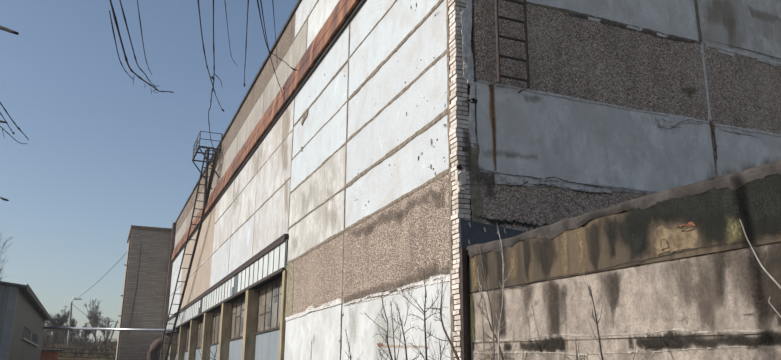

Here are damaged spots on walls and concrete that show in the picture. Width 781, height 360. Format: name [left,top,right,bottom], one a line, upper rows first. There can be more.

crack [655,119,755,165]
peeling [493,174,612,193]
spalling [654,222,698,255]
water stain [578,167,781,351]
peeling [285,274,450,322]